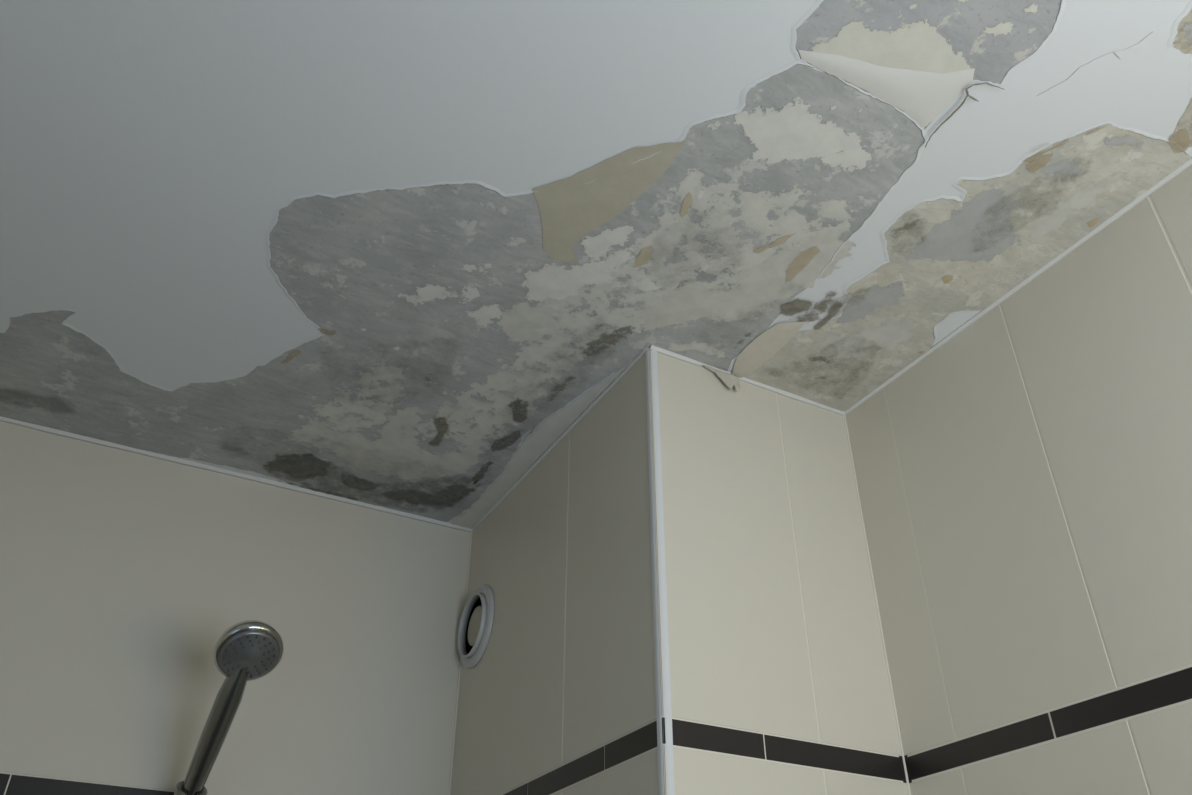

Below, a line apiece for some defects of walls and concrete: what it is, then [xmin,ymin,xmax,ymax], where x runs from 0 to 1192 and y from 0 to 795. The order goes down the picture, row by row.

crack [925,82,1003,148]
peeling [0,0,1192,522]
water stain [798,292,836,322]
water stain [584,327,631,356]
water stain [266,400,528,511]